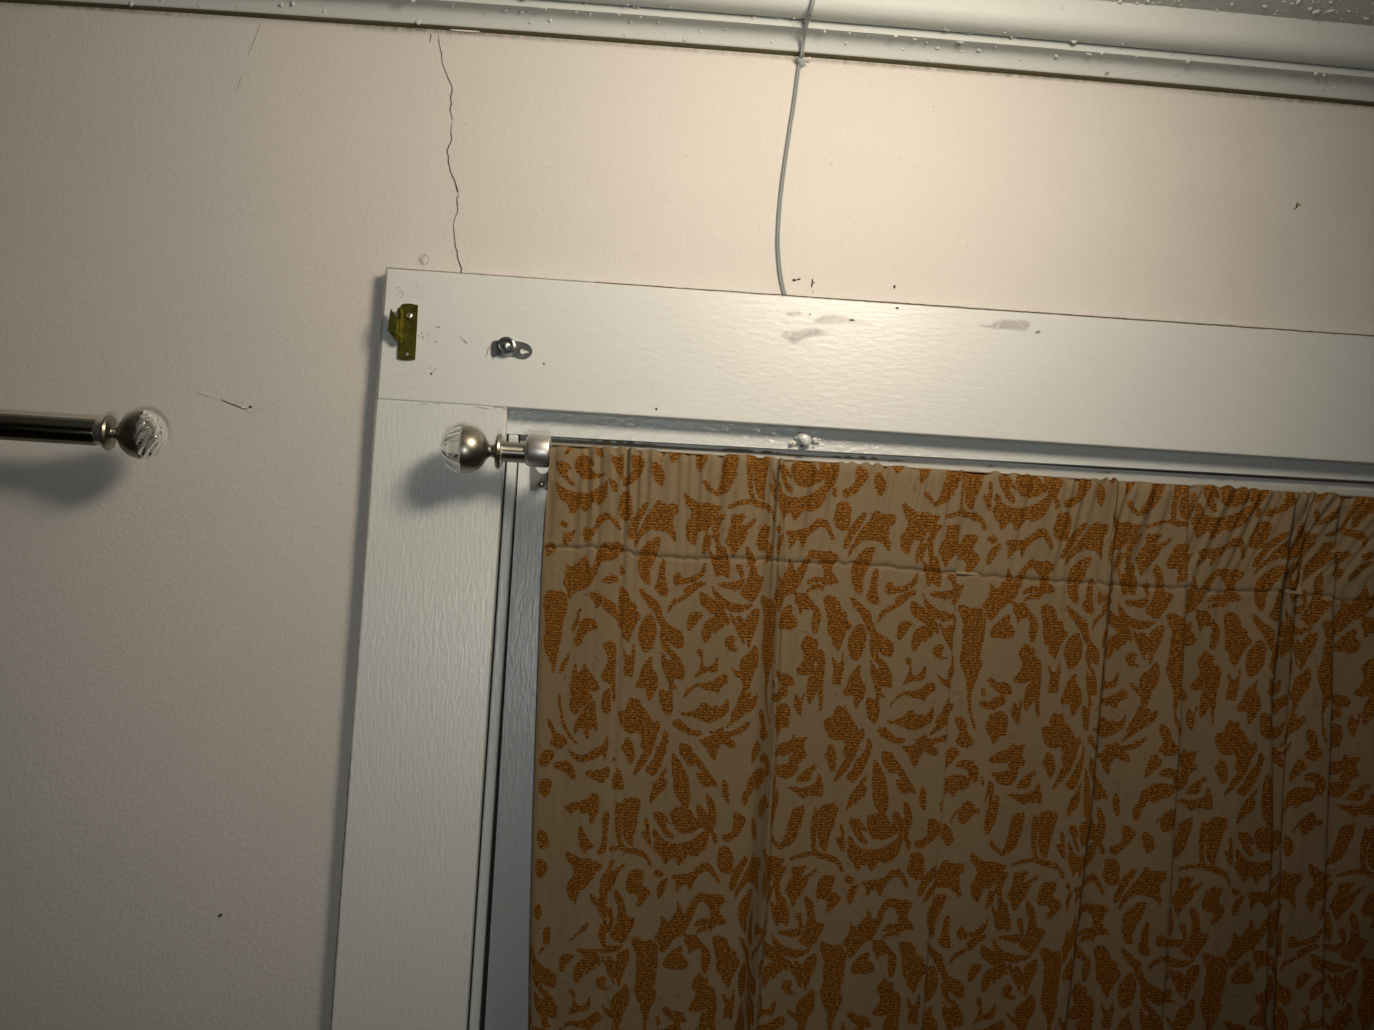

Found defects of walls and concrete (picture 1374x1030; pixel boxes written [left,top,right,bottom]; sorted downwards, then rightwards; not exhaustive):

crack [330,33,1374,1030]